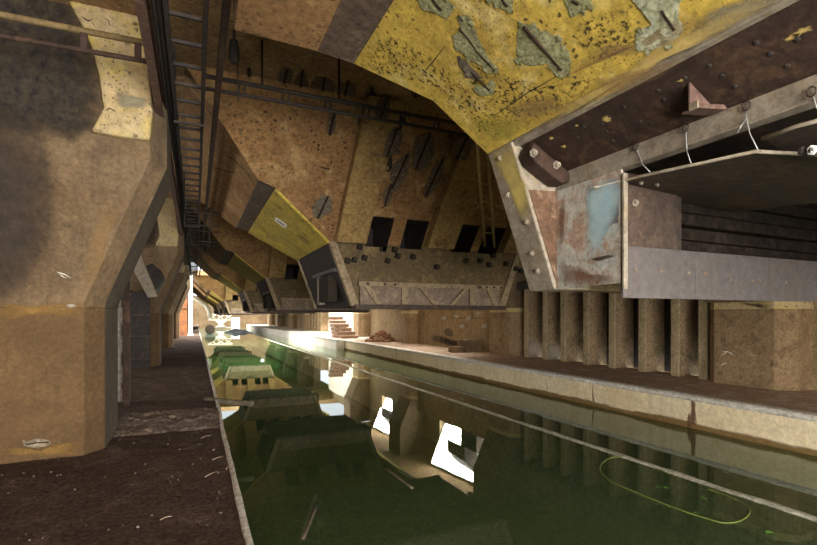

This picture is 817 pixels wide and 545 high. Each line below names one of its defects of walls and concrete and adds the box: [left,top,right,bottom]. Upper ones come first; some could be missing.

spalling [418,0,498,96]
spalling [514,21,571,79]
spalling [632,0,684,55]
damp [0,118,49,286]
corrosion [566,269,607,283]
corrosion [687,400,696,427]